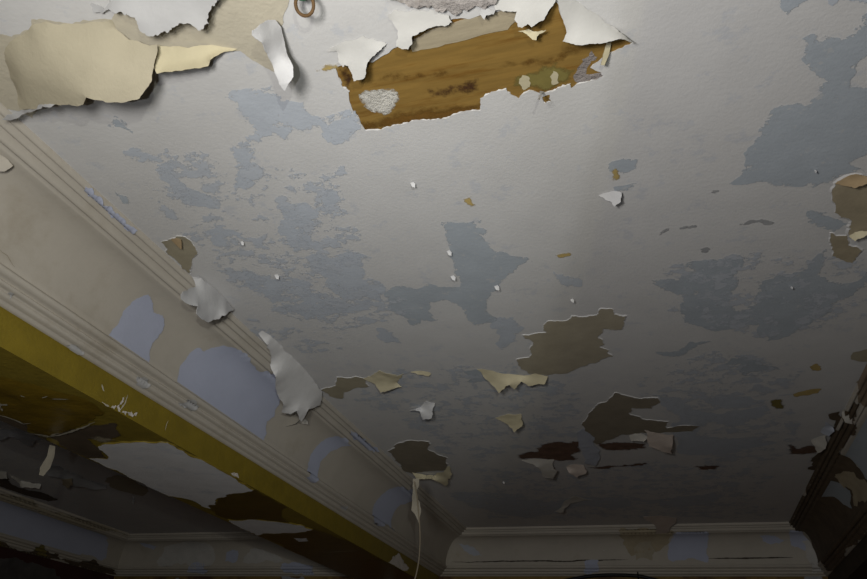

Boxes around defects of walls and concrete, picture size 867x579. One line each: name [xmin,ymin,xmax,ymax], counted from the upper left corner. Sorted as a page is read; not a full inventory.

peeling [327,0,634,81]
peeling [0,0,528,343]
peeling [652,0,867,357]
peeling [88,441,414,579]
peeling [177,331,431,440]
peeling [306,429,452,522]
peeling [410,401,435,419]
peeling [463,308,628,393]
peeling [581,392,700,454]
peeling [789,349,867,573]